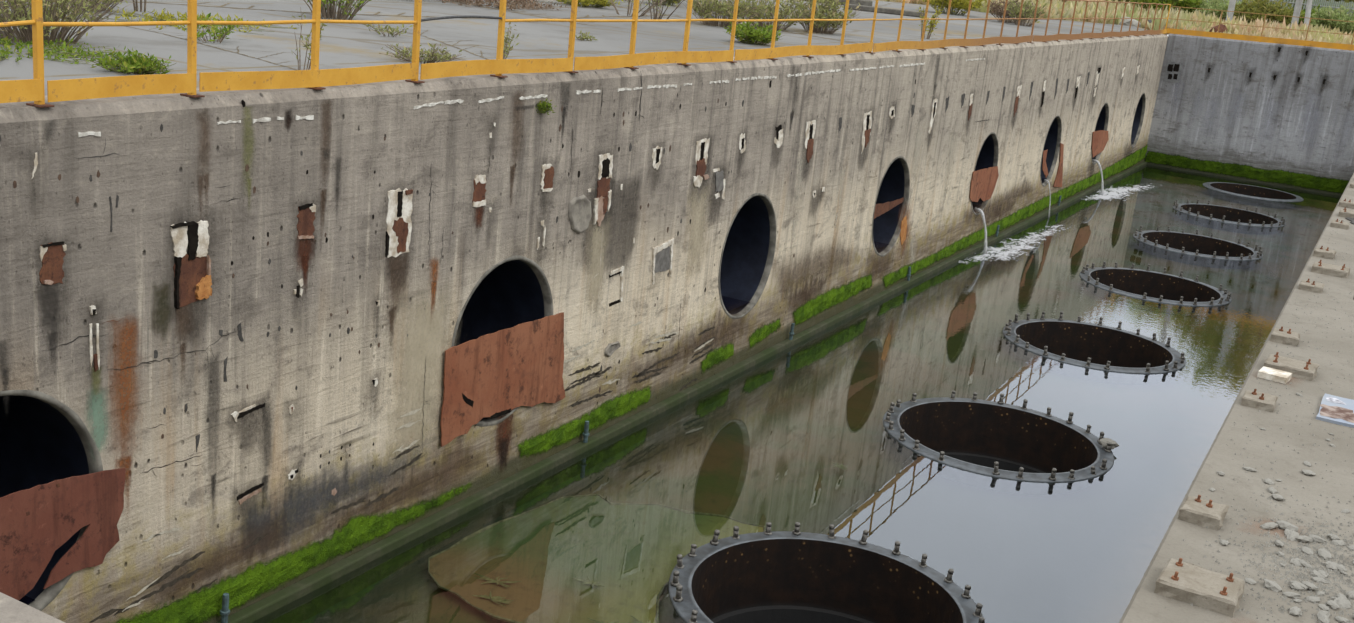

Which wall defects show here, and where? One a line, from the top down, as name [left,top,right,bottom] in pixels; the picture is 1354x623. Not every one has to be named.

corrosion [298,239,311,279]
crack [42,319,127,351]
crack [107,331,236,370]
corrosion [114,321,136,486]
water stain [170,260,468,591]
corrosion [497,414,512,465]